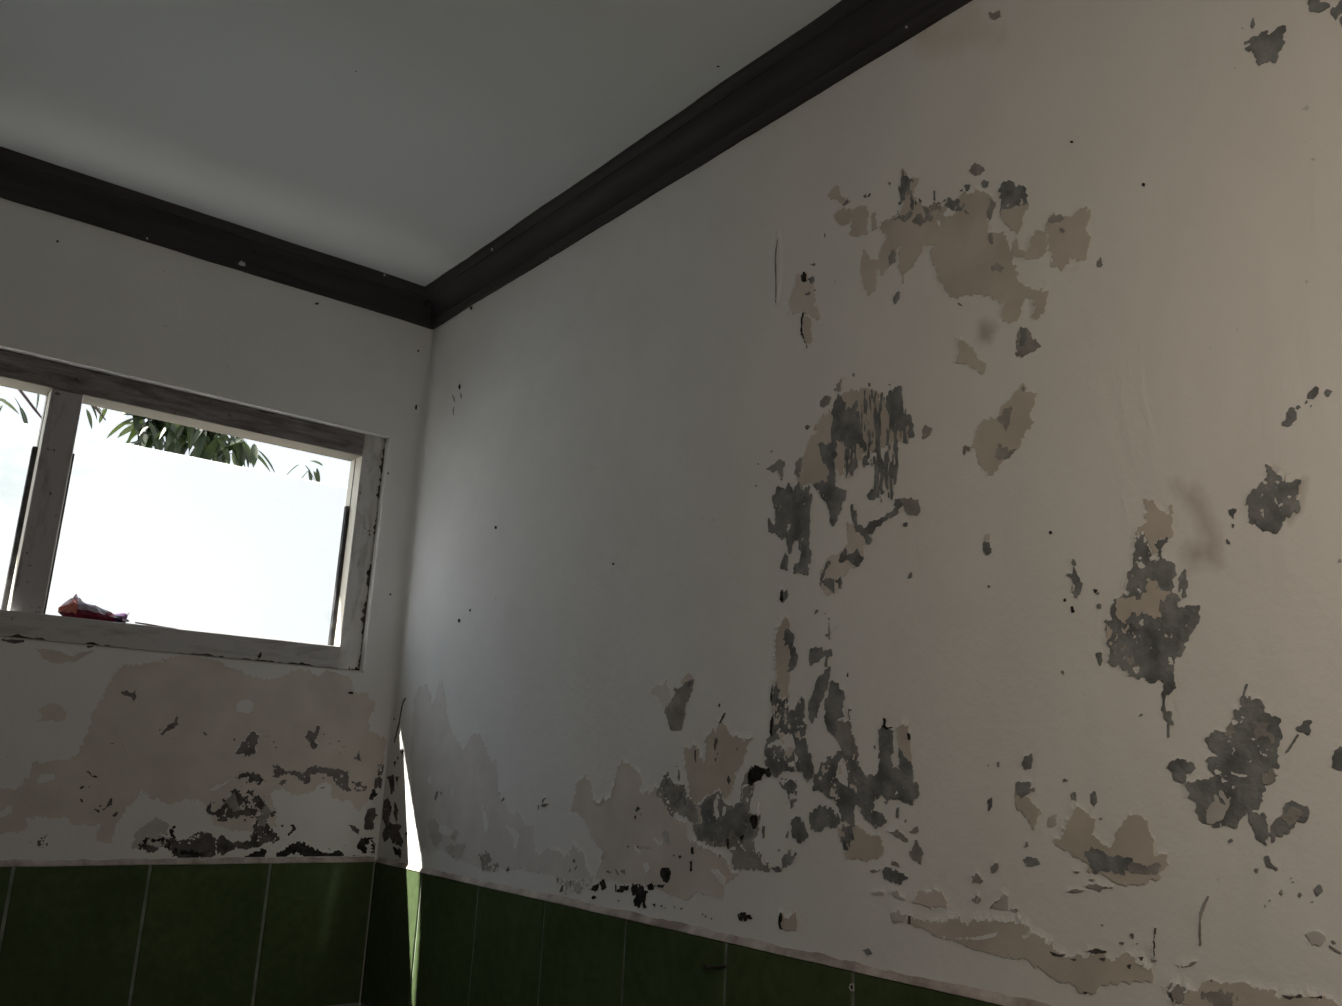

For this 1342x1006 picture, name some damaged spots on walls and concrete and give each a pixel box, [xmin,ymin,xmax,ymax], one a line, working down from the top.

peeling [1242,18,1286,66]
peeling [1307,0,1342,25]
peeling [824,163,1103,375]
peeling [0,654,387,848]
peeling [409,373,1342,1006]